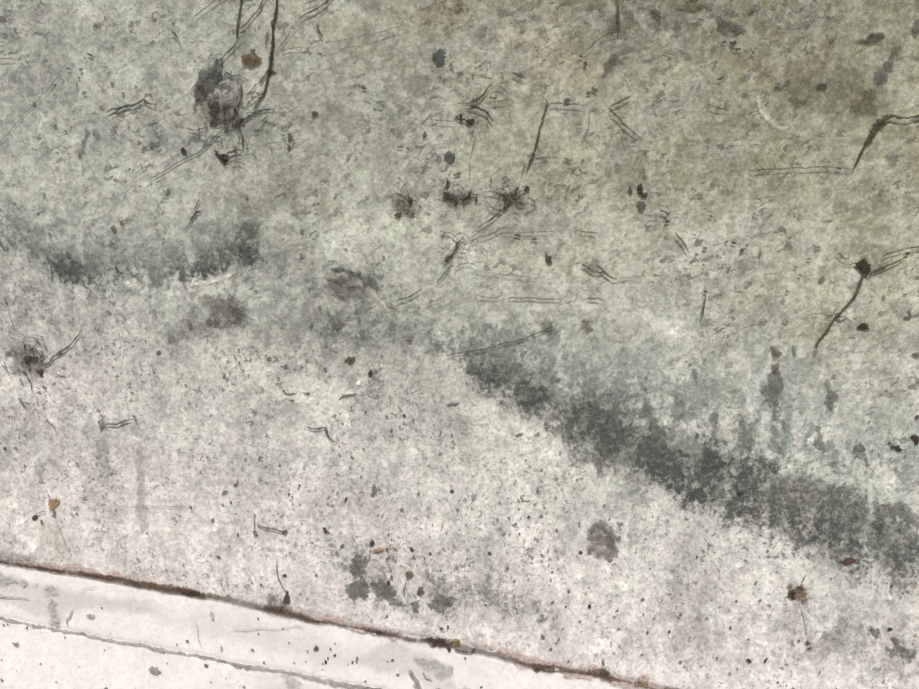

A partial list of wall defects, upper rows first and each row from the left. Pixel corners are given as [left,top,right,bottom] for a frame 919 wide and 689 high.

crack [749,114,919,171]
crack [813,246,919,351]
water stain [435,326,919,595]